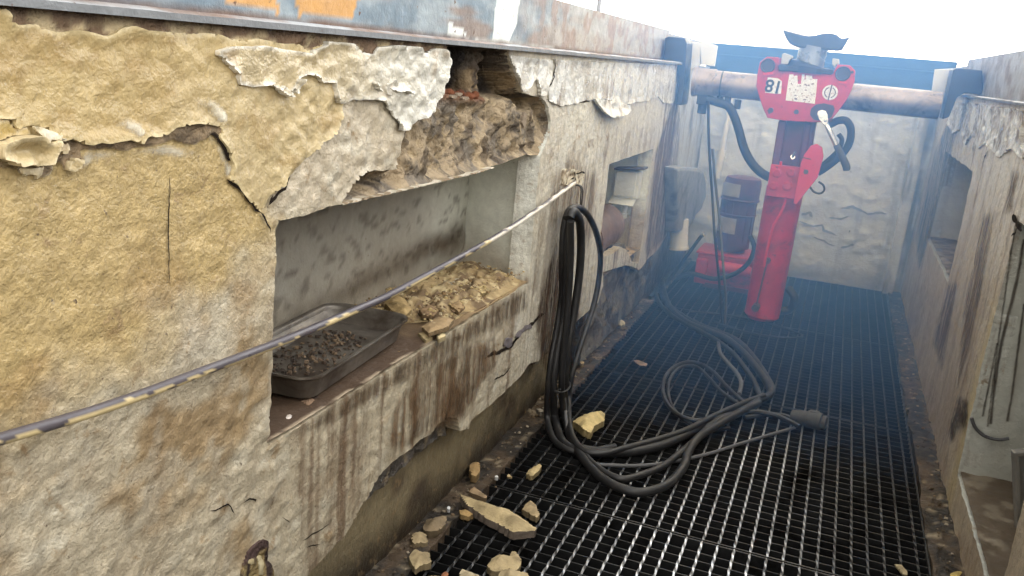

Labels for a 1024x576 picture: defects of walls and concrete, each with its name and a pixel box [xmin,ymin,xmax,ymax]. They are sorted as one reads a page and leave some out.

peeling [0,5,677,211]
peeling [946,102,1024,159]
crack [211,132,290,231]
crack [165,179,173,281]
crack [487,313,545,380]
crack [212,498,257,513]
spalling [240,539,274,576]